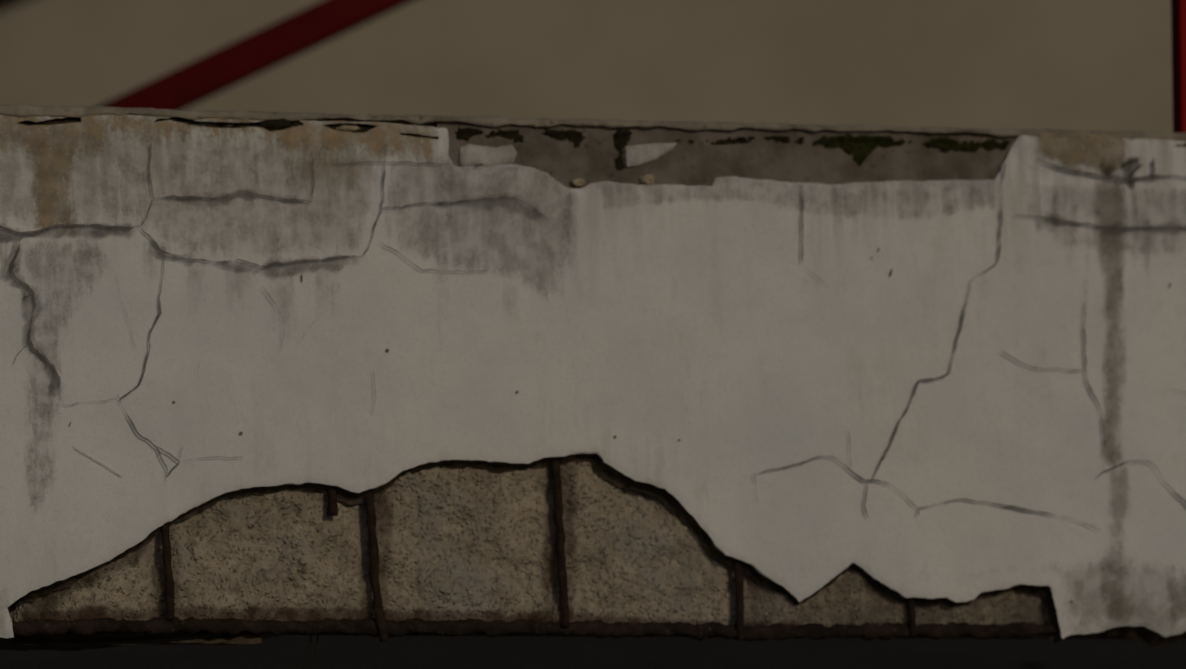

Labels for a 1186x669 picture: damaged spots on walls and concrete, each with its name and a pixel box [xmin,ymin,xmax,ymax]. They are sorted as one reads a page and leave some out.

damp [0,114,196,232]
damp [263,119,433,161]
peeling [399,123,1018,189]
crack [0,144,548,484]
crack [754,158,1186,530]
damp [1097,184,1124,463]
spalling [9,452,1062,642]
corrosion [25,605,155,621]
corrosion [188,604,367,621]